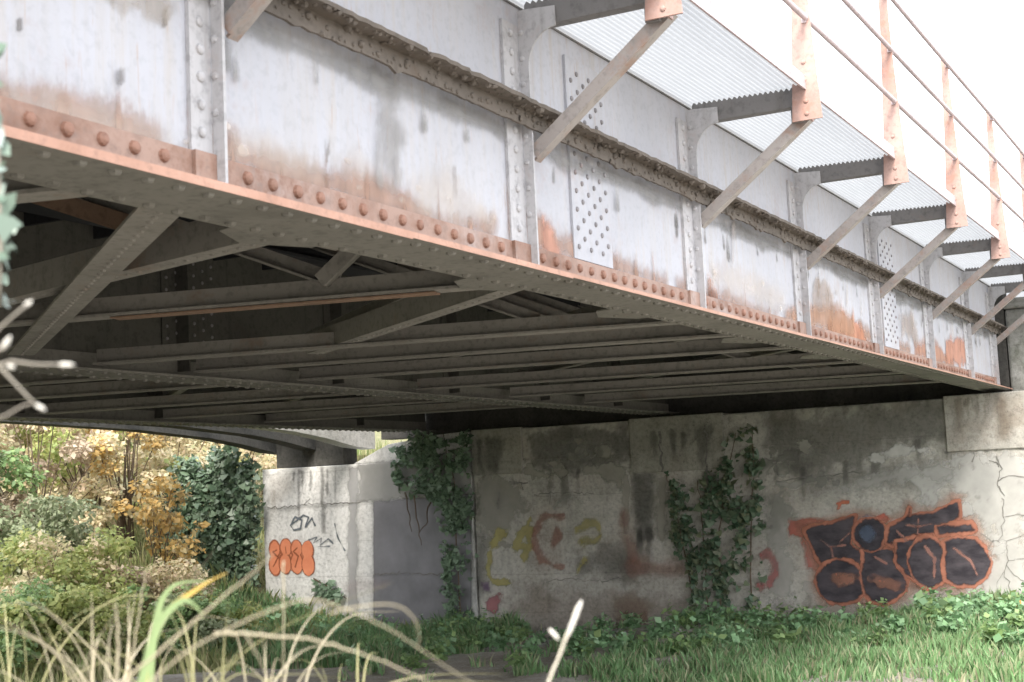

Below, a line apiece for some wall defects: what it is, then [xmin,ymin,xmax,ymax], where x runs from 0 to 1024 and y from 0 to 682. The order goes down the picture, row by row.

rust [0,89,156,139]
rust [227,134,440,220]
rust [526,212,583,261]
rust [613,256,640,276]
rust [787,308,884,343]
rust [899,338,966,368]
crack [944,448,1024,589]